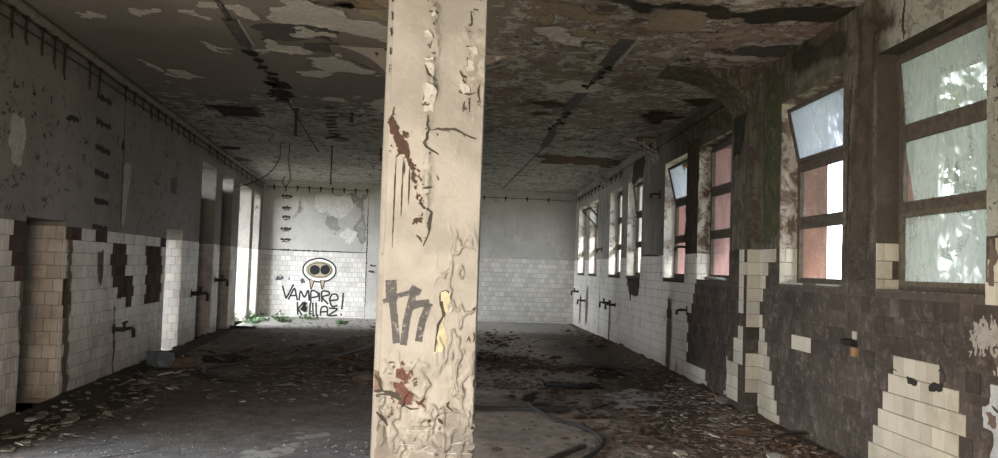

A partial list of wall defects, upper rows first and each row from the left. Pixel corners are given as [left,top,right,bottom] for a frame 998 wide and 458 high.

peeling [178,0,394,78]
peeling [367,98,385,112]
peeling [422,0,450,154]
peeling [542,80,603,99]
crack [423,117,476,155]
corrosion [387,106,423,247]
peeling [314,192,357,244]
crack [416,186,433,246]
peeling [95,230,166,307]
spalling [61,227,82,393]
spalling [363,424,395,458]
peeling [401,413,476,458]